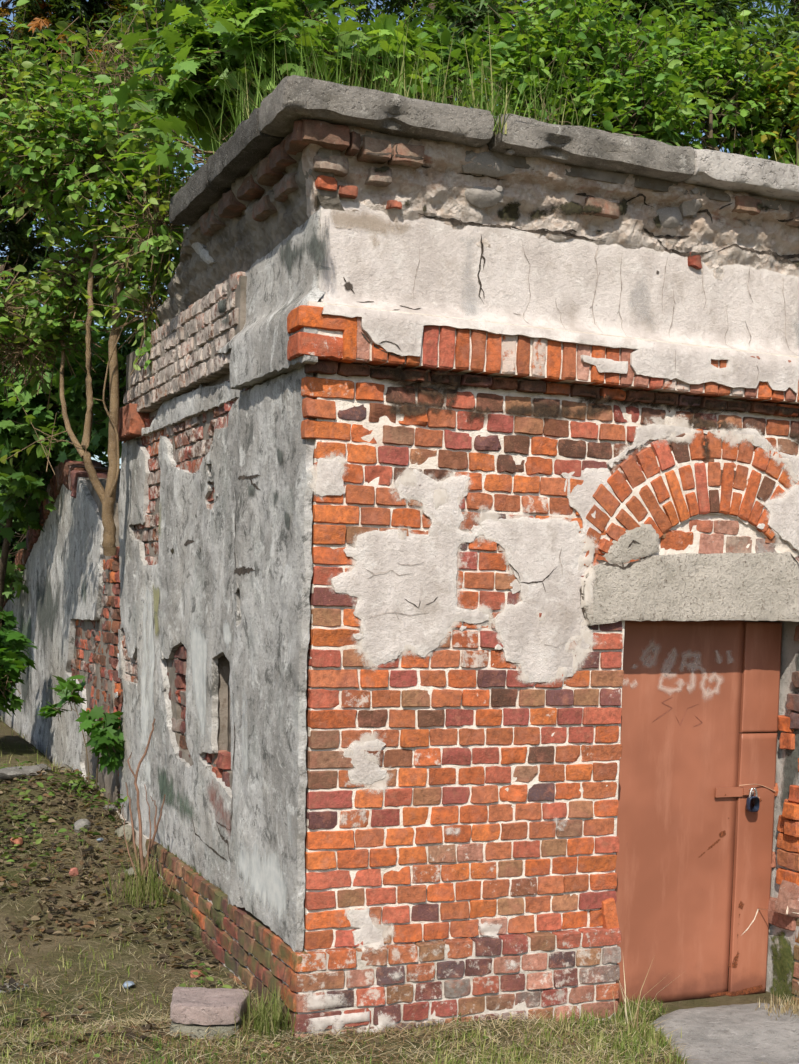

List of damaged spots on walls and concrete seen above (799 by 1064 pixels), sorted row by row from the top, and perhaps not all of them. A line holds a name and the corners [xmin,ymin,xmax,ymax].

crack [356,250,421,310]
crack [418,213,628,337]
crack [627,193,799,379]
crack [361,332,401,356]
spalling [131,388,250,565]
peeling [309,453,346,499]
peeling [331,415,799,683]
peeling [342,733,389,791]
peeling [345,908,393,952]